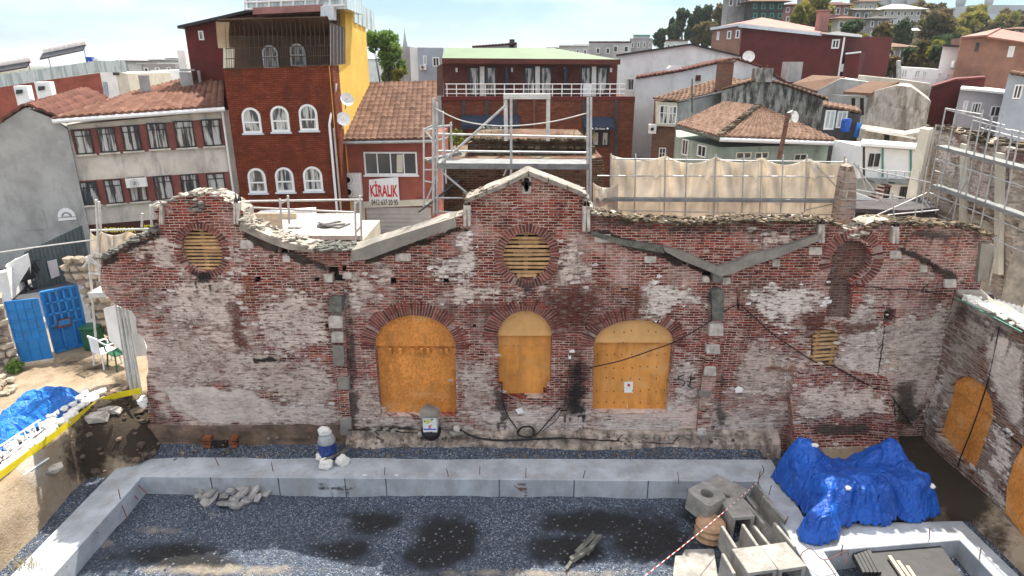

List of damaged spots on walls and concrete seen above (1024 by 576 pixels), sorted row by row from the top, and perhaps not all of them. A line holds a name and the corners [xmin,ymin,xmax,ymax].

flaking render [101,232,387,425]
spalling [344,227,604,336]
flaking render [639,274,709,322]
flaking render [722,281,951,436]
flaking render [983,321,1024,490]